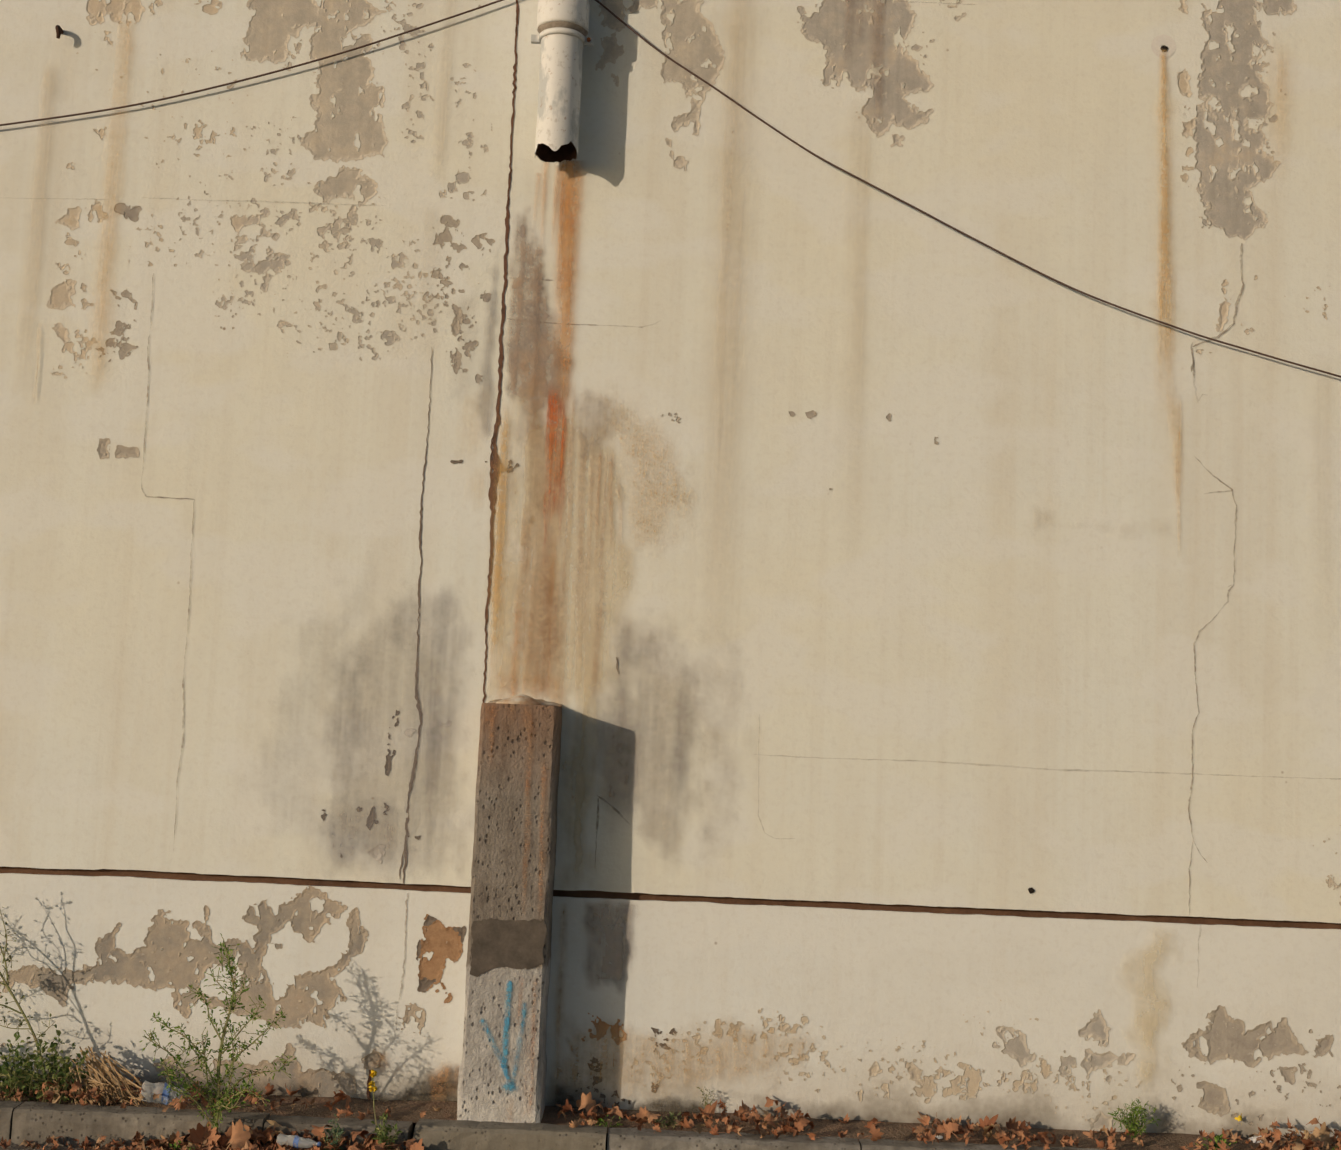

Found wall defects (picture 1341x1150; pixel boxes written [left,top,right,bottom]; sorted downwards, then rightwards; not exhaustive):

peeling [46,0,495,384]
corrosion [561,161,577,379]
peeling [595,0,725,171]
peeling [797,0,935,147]
peeling [1177,0,1297,240]
corrosion [493,429,507,638]
corrosion [547,393,564,502]
crack [399,351,433,976]
crack [1188,636,1205,904]
peeling [0,885,385,1097]
flaking render [398,914,466,1034]
peeling [1171,1005,1341,1127]